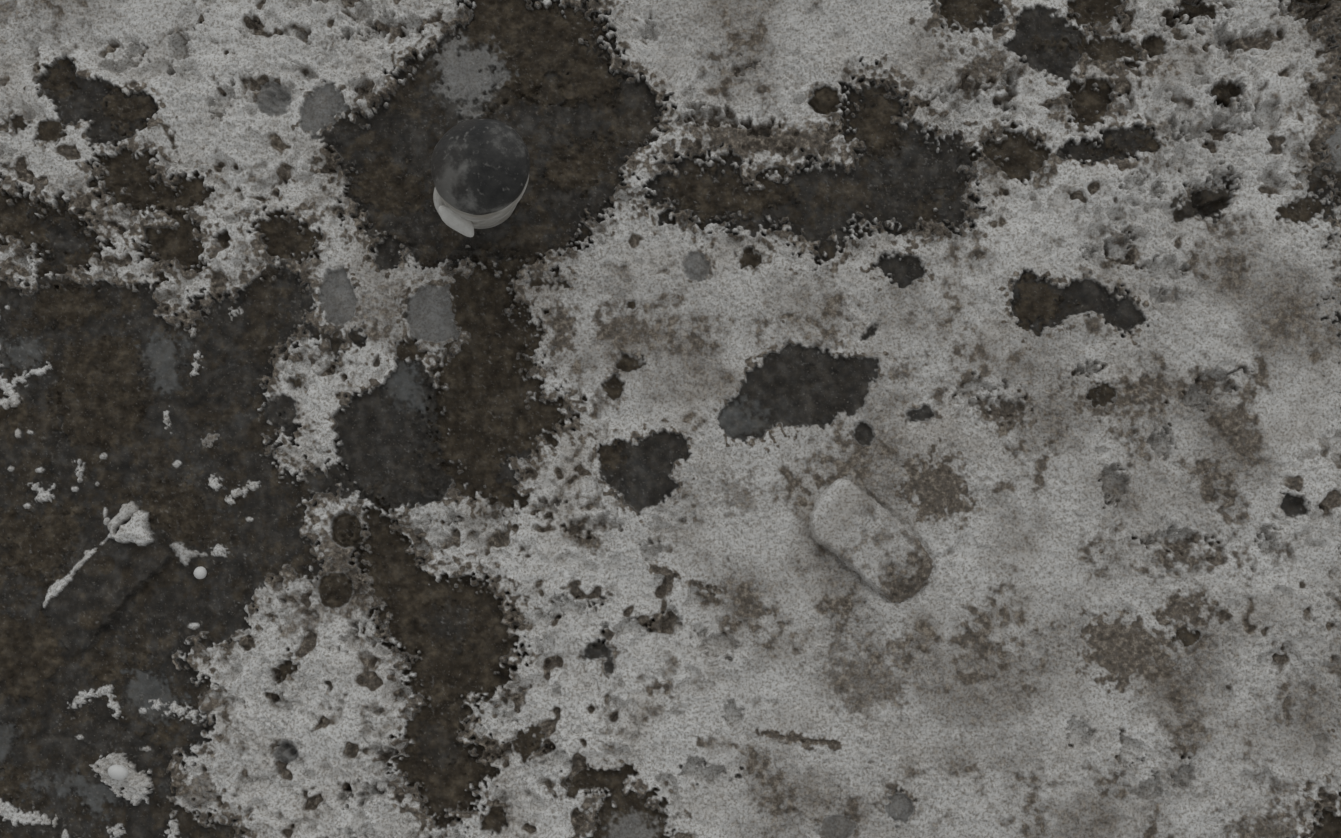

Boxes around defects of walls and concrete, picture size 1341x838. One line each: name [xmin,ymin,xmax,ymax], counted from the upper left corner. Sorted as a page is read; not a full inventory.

spalling [1173,0,1231,25]
spalling [1209,81,1246,108]
spalling [631,0,1169,266]
spalling [1276,117,1341,250]
hole [682,252,712,283]
spalling [735,246,764,270]
spalling [1010,270,1147,338]
spalling [1317,287,1341,340]
spalling [718,321,881,448]
spalling [0,0,677,838]
spalling [598,429,691,516]
spalling [1293,785,1341,838]